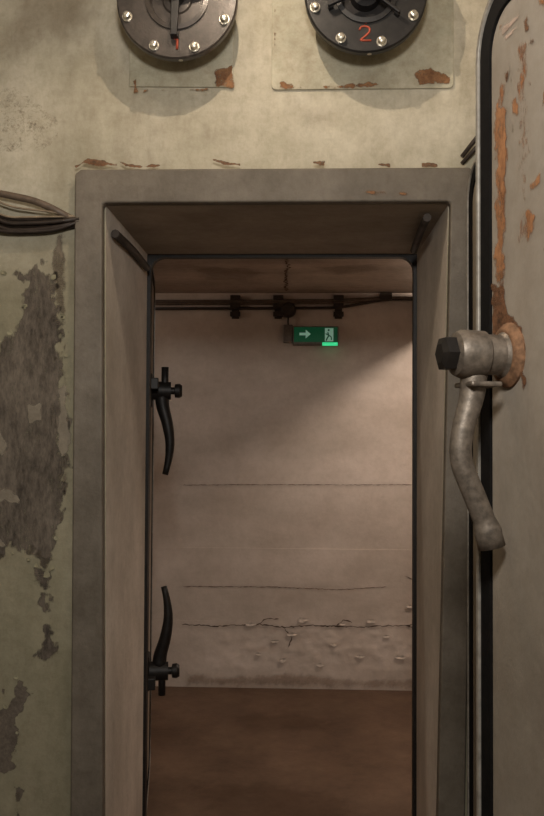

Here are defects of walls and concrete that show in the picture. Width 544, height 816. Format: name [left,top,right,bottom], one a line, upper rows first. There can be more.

corrosion [491,40,535,335]
peeling [0,235,72,612]
peeling [0,675,30,773]
peeling [33,624,59,660]